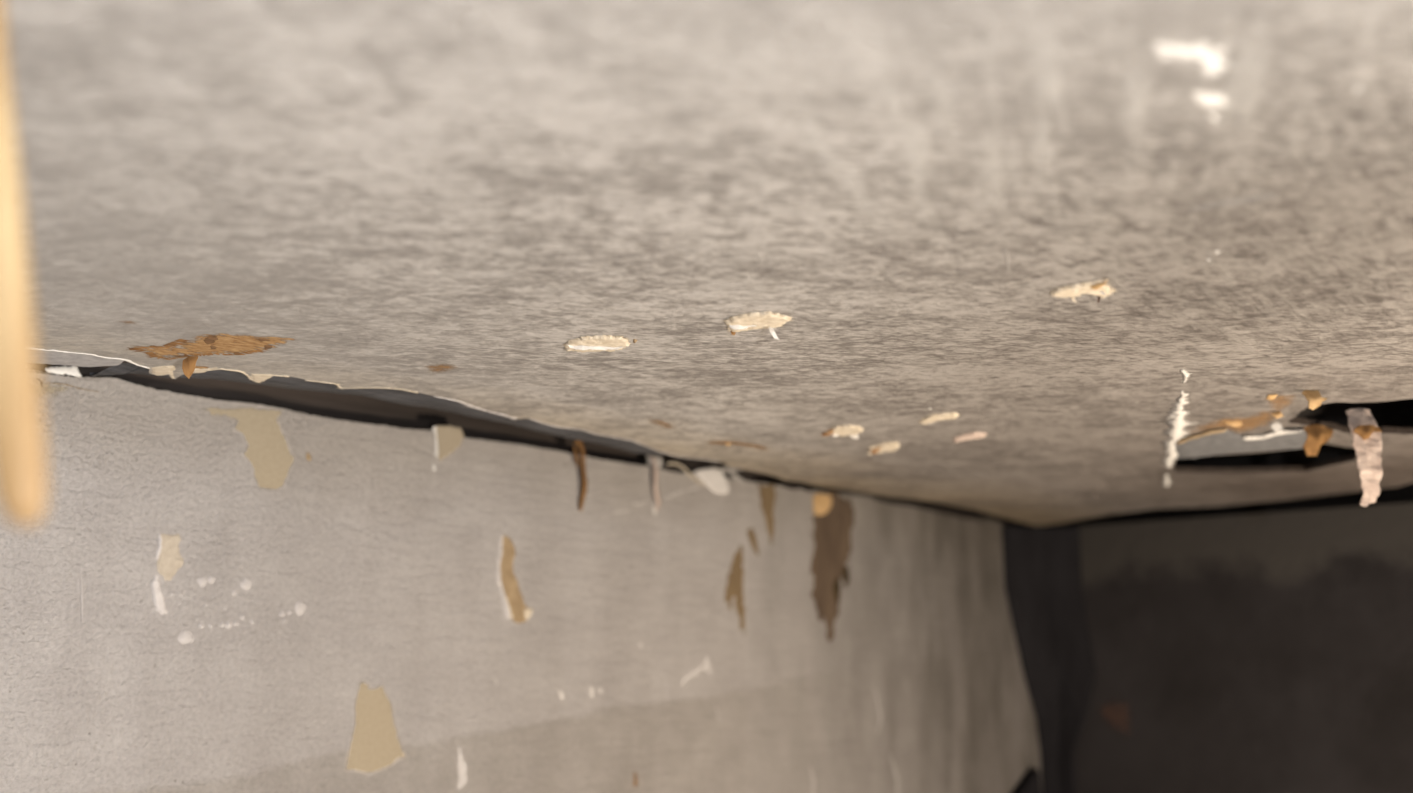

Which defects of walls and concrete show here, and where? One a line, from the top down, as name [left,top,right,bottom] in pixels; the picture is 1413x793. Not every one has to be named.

peeling [563,335,637,352]
peeling [722,311,792,340]
peeling [1050,278,1116,303]
peeling [203,407,311,491]
peeling [573,440,588,511]
peeling [813,493,832,516]
spalling [1174,390,1413,507]
peeling [151,532,184,615]
peeling [496,534,534,623]
peeling [345,681,405,775]